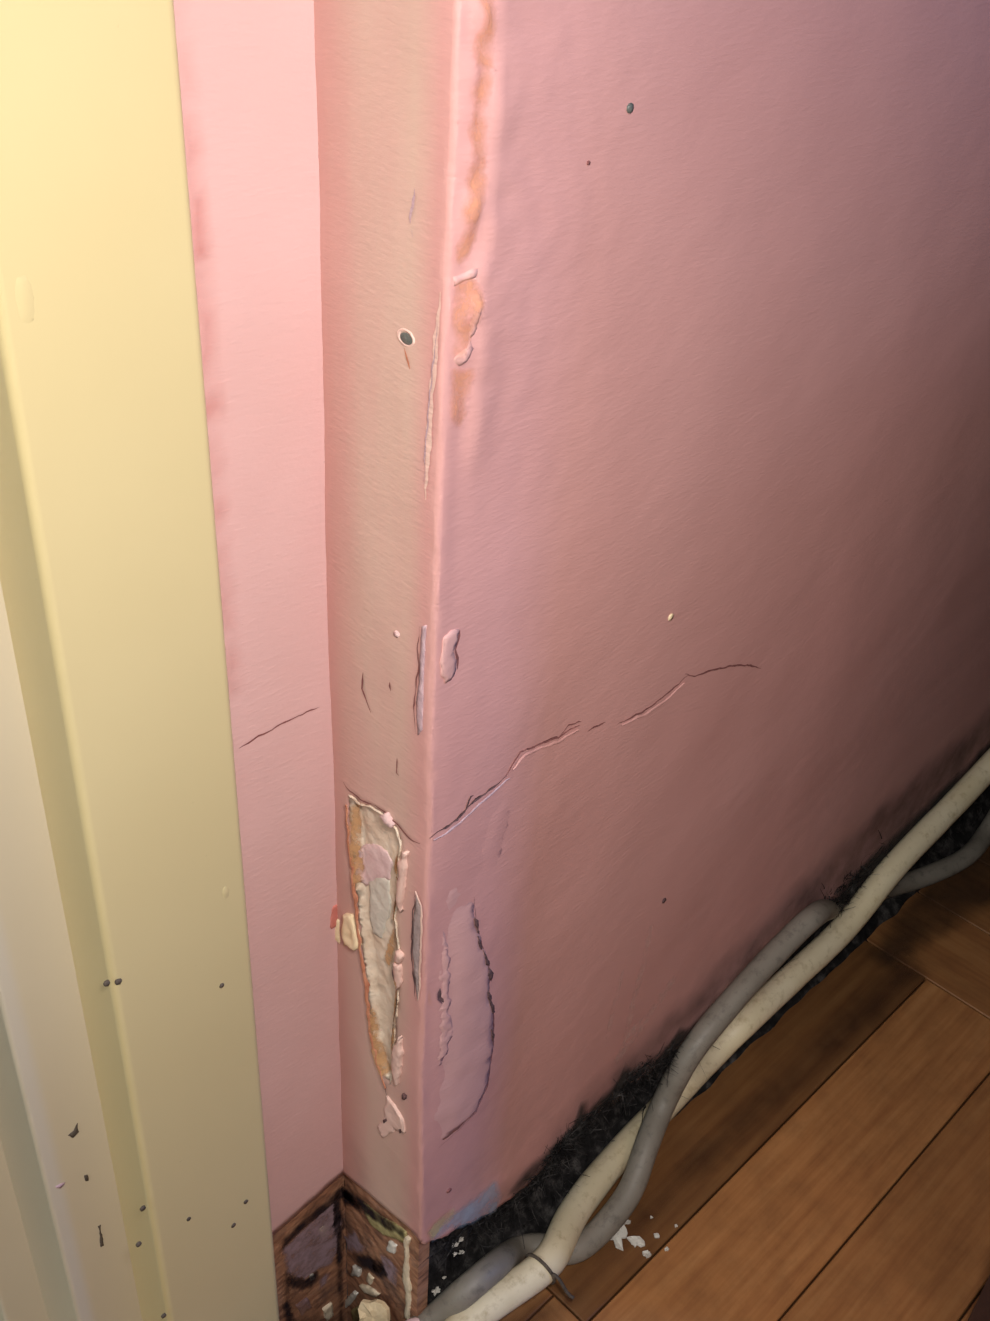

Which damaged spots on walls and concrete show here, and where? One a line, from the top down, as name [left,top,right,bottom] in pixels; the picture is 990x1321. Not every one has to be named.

crack [240,708,317,748]
peeling [413,625,460,735]
crack [344,664,758,844]
water stain [835,745,990,903]
flaking render [330,794,423,1138]
peeling [434,888,495,1144]
water stain [880,852,990,983]
water stain [514,1025,695,1192]
water stain [430,1185,497,1237]
peeling [358,1299,390,1321]